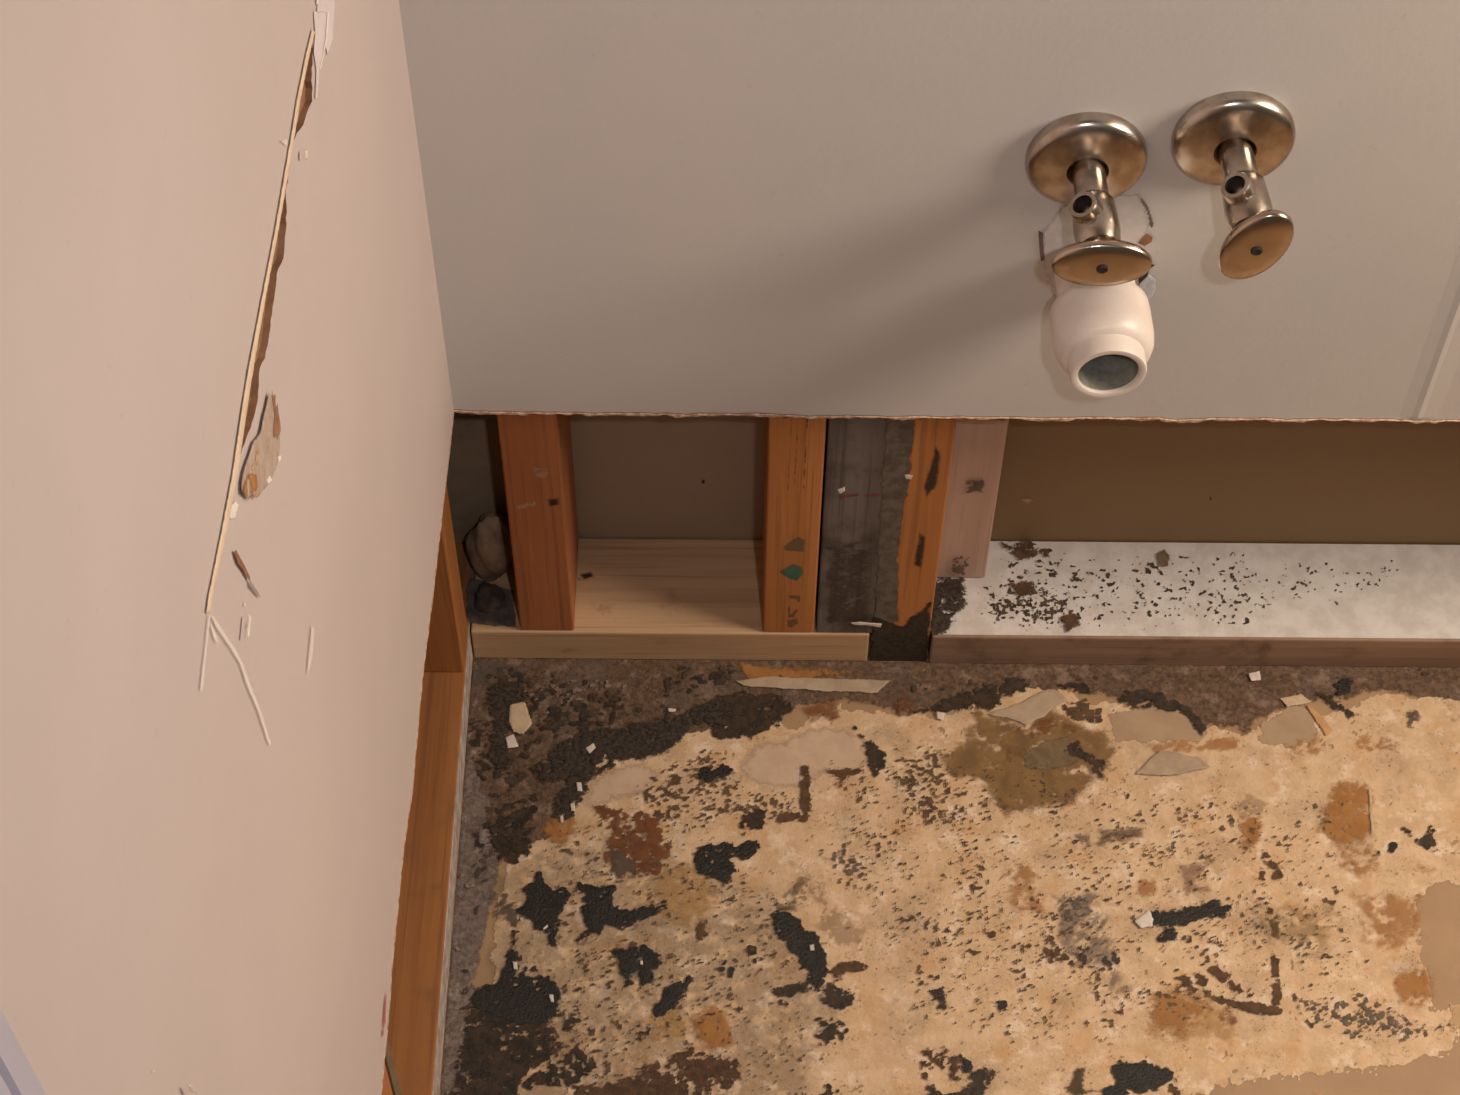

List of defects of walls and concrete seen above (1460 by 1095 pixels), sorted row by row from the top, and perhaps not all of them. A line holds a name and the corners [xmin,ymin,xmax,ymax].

mould [930,539,1398,635]
peeling [506,702,532,748]
peeling [585,765,657,806]
peeling [740,727,868,788]
spalling [989,689,1067,725]
peeling [1108,705,1210,775]
peeling [1258,694,1333,748]
water stain [446,659,1451,1095]
peeling [811,886,860,943]